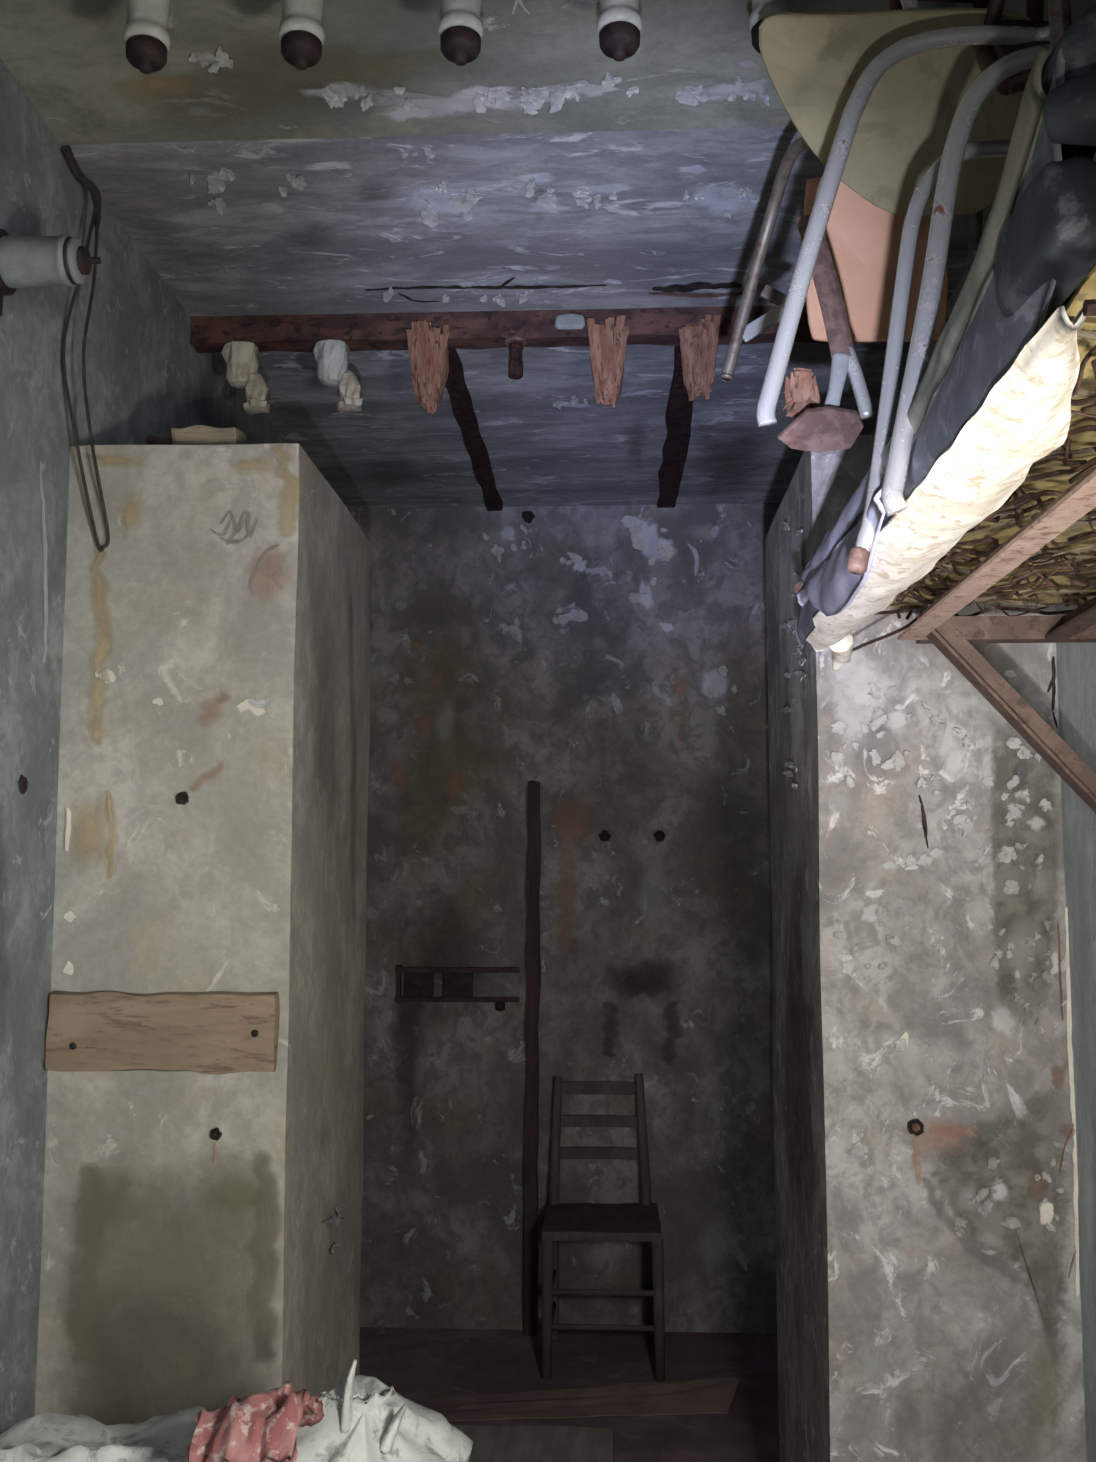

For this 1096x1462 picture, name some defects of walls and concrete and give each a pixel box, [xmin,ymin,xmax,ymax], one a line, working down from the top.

peeling [307,72,639,120]
peeling [190,167,235,216]
peeling [250,174,307,215]
peeling [405,182,485,228]
peeling [515,172,632,213]
peeling [831,637,973,796]
peeling [882,848,944,870]
spalling [982,734,1058,1038]
damp [75,1155,279,1425]